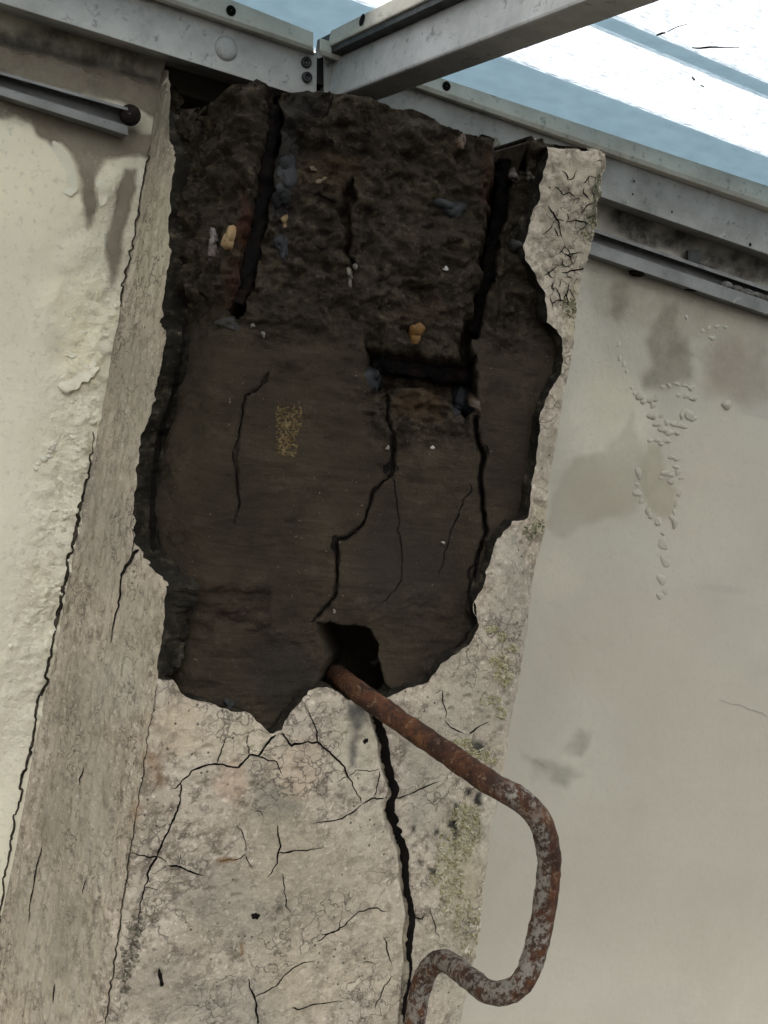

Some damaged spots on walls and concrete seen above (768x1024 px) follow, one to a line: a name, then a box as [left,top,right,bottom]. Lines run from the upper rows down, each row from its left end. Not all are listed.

leakage [0,45,159,116]
leakage [0,100,151,224]
leakage [106,169,136,276]
crack [541,160,602,308]
crack [232,375,268,527]
crack [310,393,403,622]
spalling [133,79,588,734]
crack [439,419,489,648]
crack [0,432,95,922]
crack [435,690,488,734]
crack [105,686,439,1024]